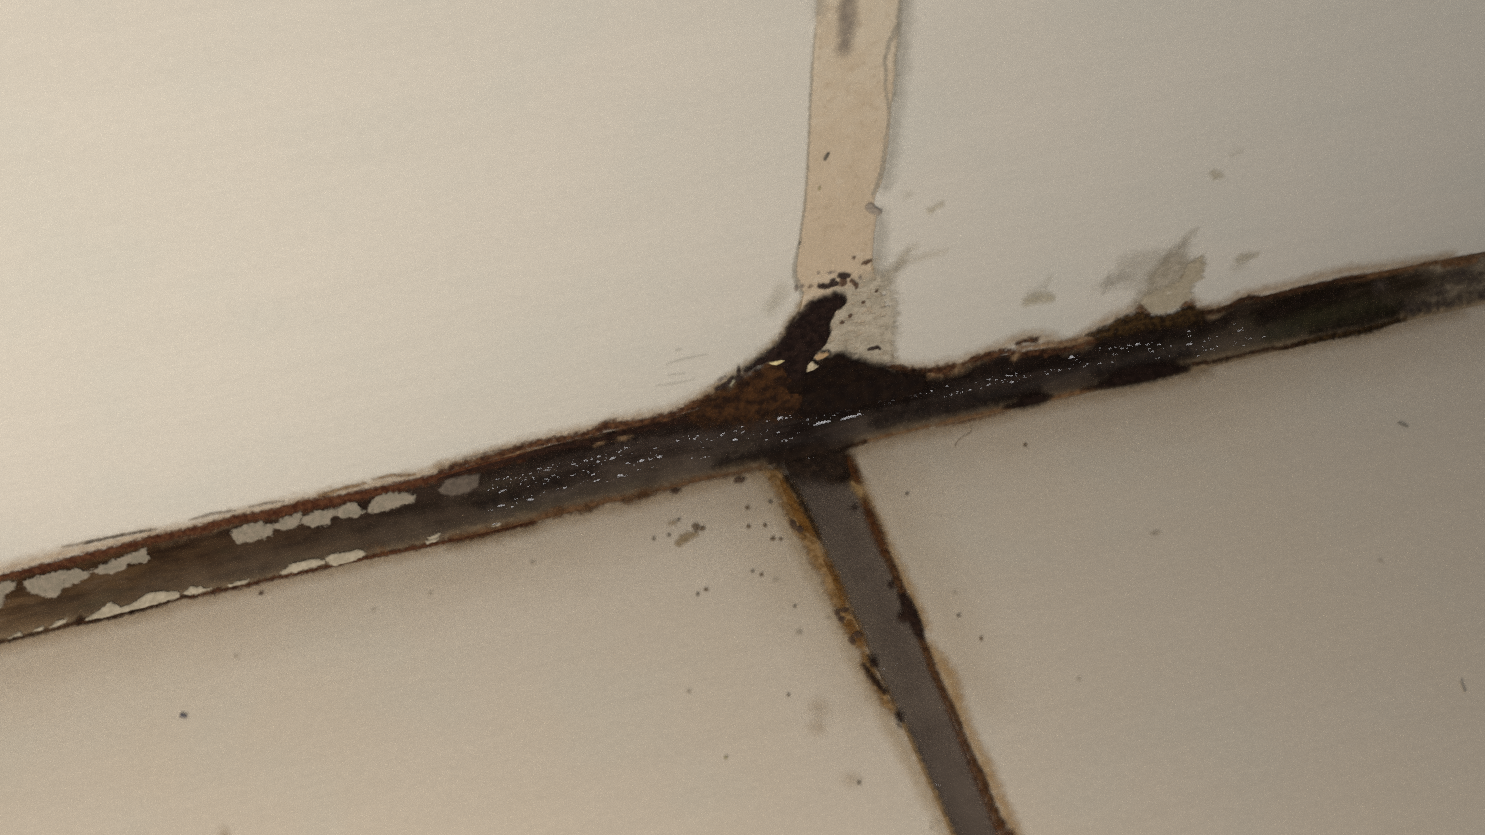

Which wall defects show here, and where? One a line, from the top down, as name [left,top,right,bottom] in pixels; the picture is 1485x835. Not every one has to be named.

leakage [717,255,1485,483]
peeling [438,475,479,496]
peeling [232,492,416,544]
peeling [0,548,150,608]
peeling [280,550,365,574]
peeling [86,579,249,620]
peeling [10,618,67,638]